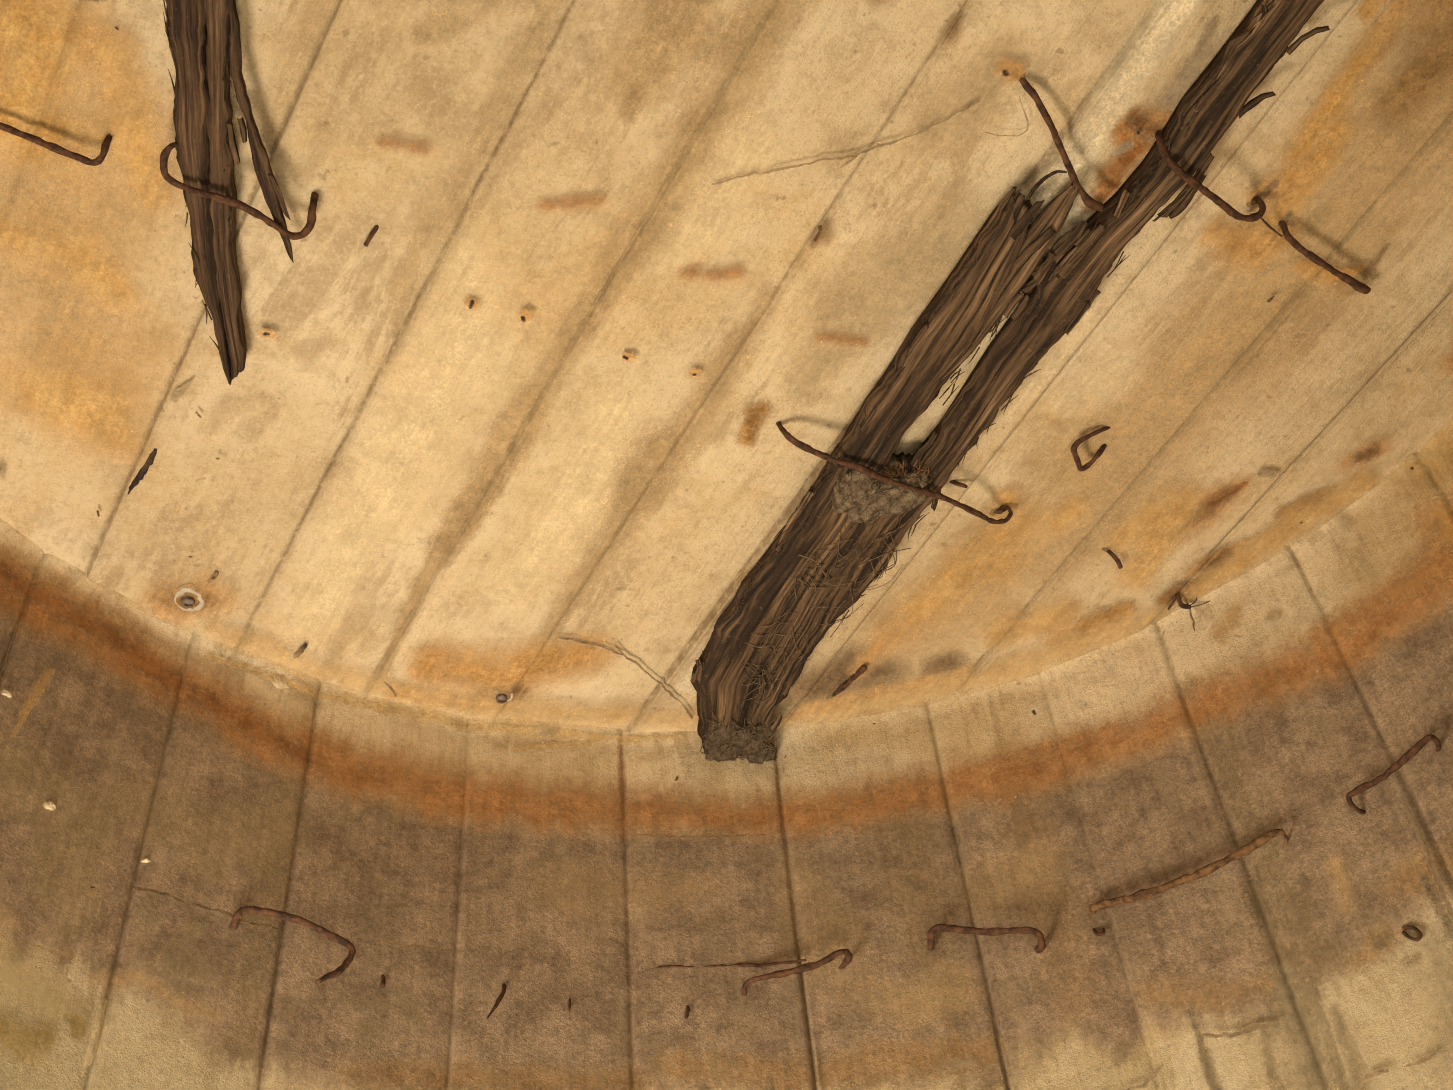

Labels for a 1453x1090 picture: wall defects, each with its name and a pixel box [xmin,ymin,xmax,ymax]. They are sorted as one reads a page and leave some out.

corrosion [0,0,170,208]
crack [712,96,1029,185]
damp [1023,0,1200,227]
corrosion [1085,108,1170,212]
corrosion [1296,261,1366,285]
corrosion [737,404,770,448]
corrosion [0,429,1453,836]
damp [0,595,1453,1090]